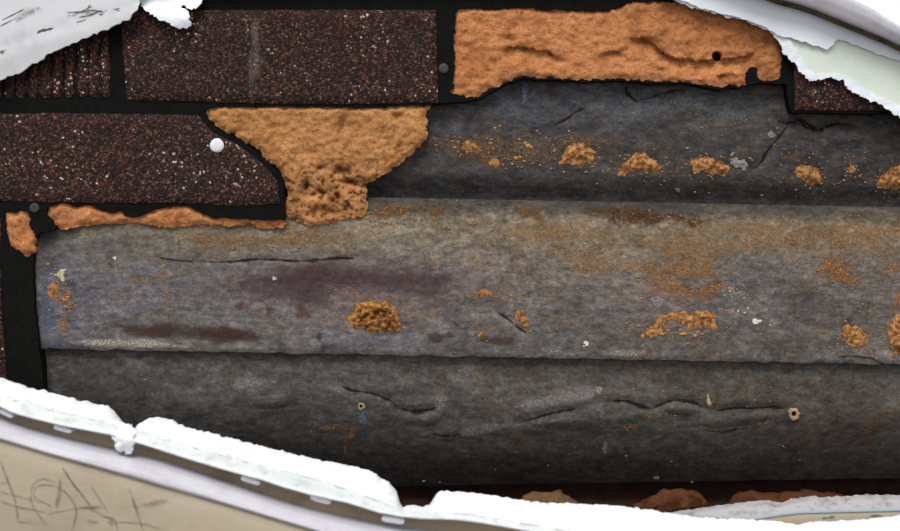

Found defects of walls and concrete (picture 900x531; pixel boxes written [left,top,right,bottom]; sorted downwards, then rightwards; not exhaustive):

crack [755,119,851,168]
peeling [711,152,753,180]
crack [160,255,353,263]
damp [89,323,259,348]
crack [341,386,436,413]
crack [519,408,575,423]
crack [614,399,784,432]